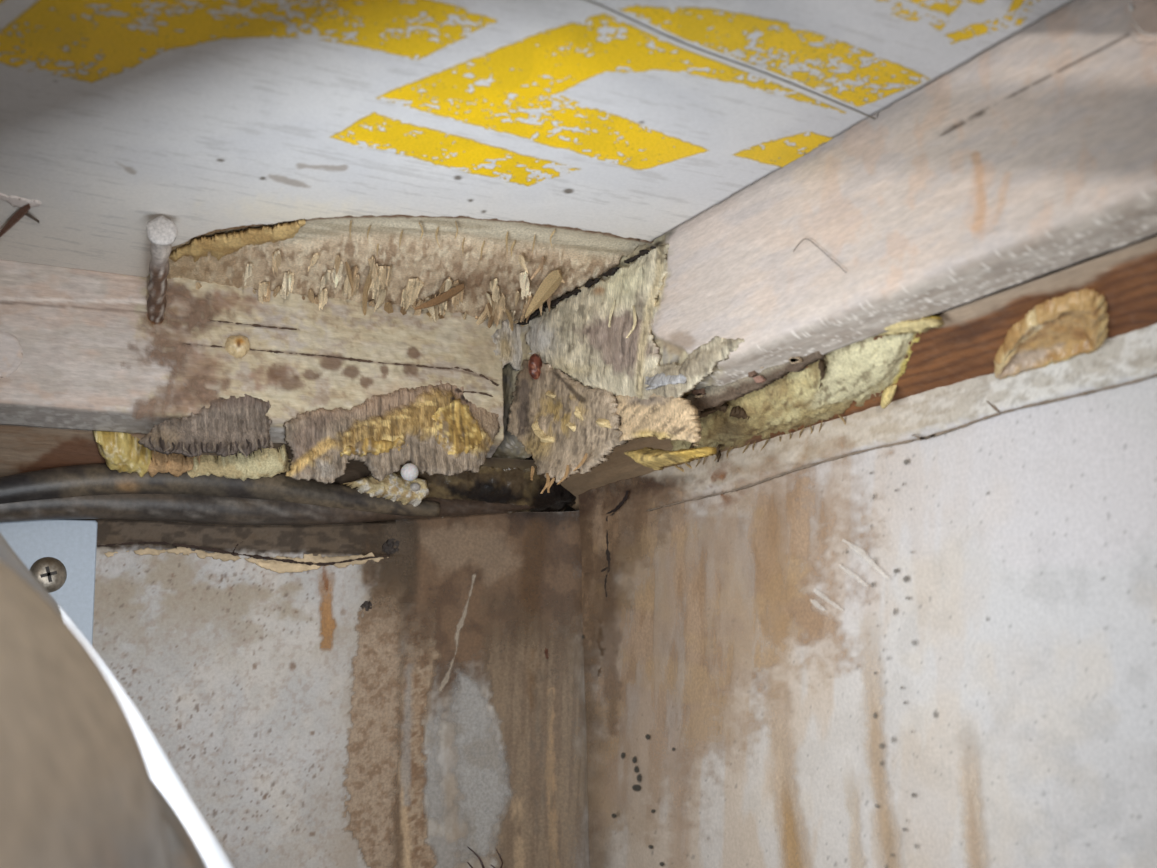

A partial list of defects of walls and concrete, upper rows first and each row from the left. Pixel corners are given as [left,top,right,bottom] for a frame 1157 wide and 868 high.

damp [130,285,229,419]
peeling [748,370,766,383]
peeling [531,419,554,443]
peeling [565,406,611,432]
rust [320,576,336,649]
damp [364,466,734,805]
damp [747,464,846,698]